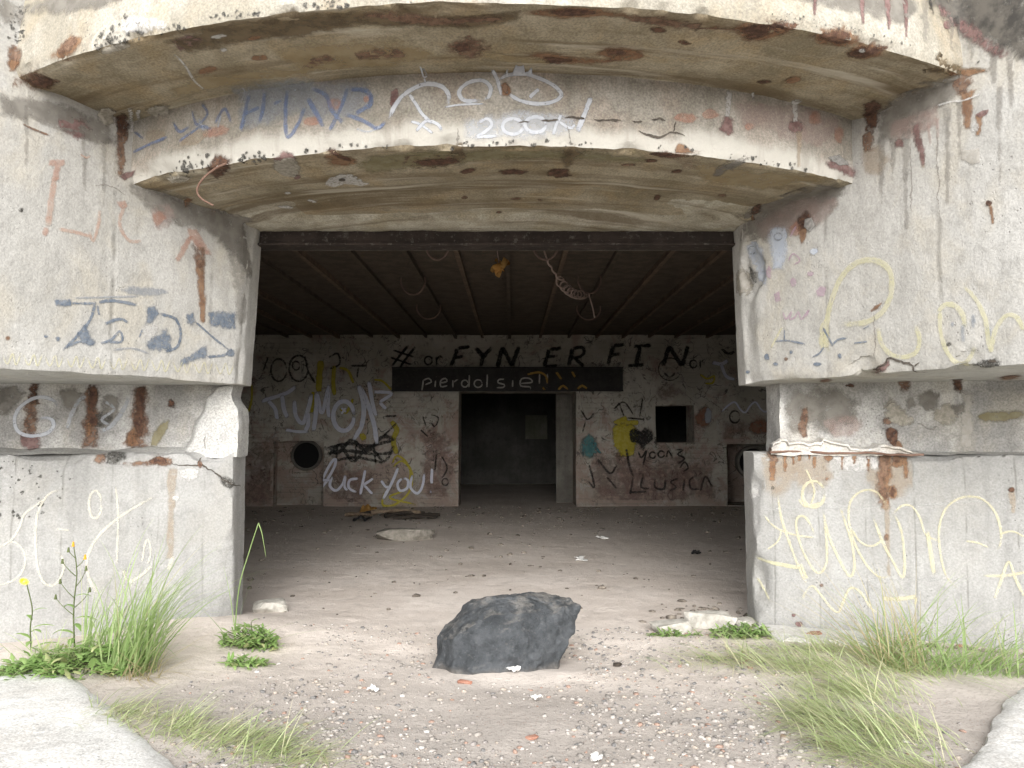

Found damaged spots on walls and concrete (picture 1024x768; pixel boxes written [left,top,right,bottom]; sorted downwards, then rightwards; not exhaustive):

rust [345,5,799,64]
rust [115,113,135,180]
rust [862,100,881,151]
rust [895,124,925,165]
rust [939,74,988,135]
rust [192,245,206,322]
crack [873,357,925,373]
rust [20,383,40,450]
rust [81,384,148,464]
rust [798,407,809,438]
crack [172,436,240,488]
rust [767,418,908,509]